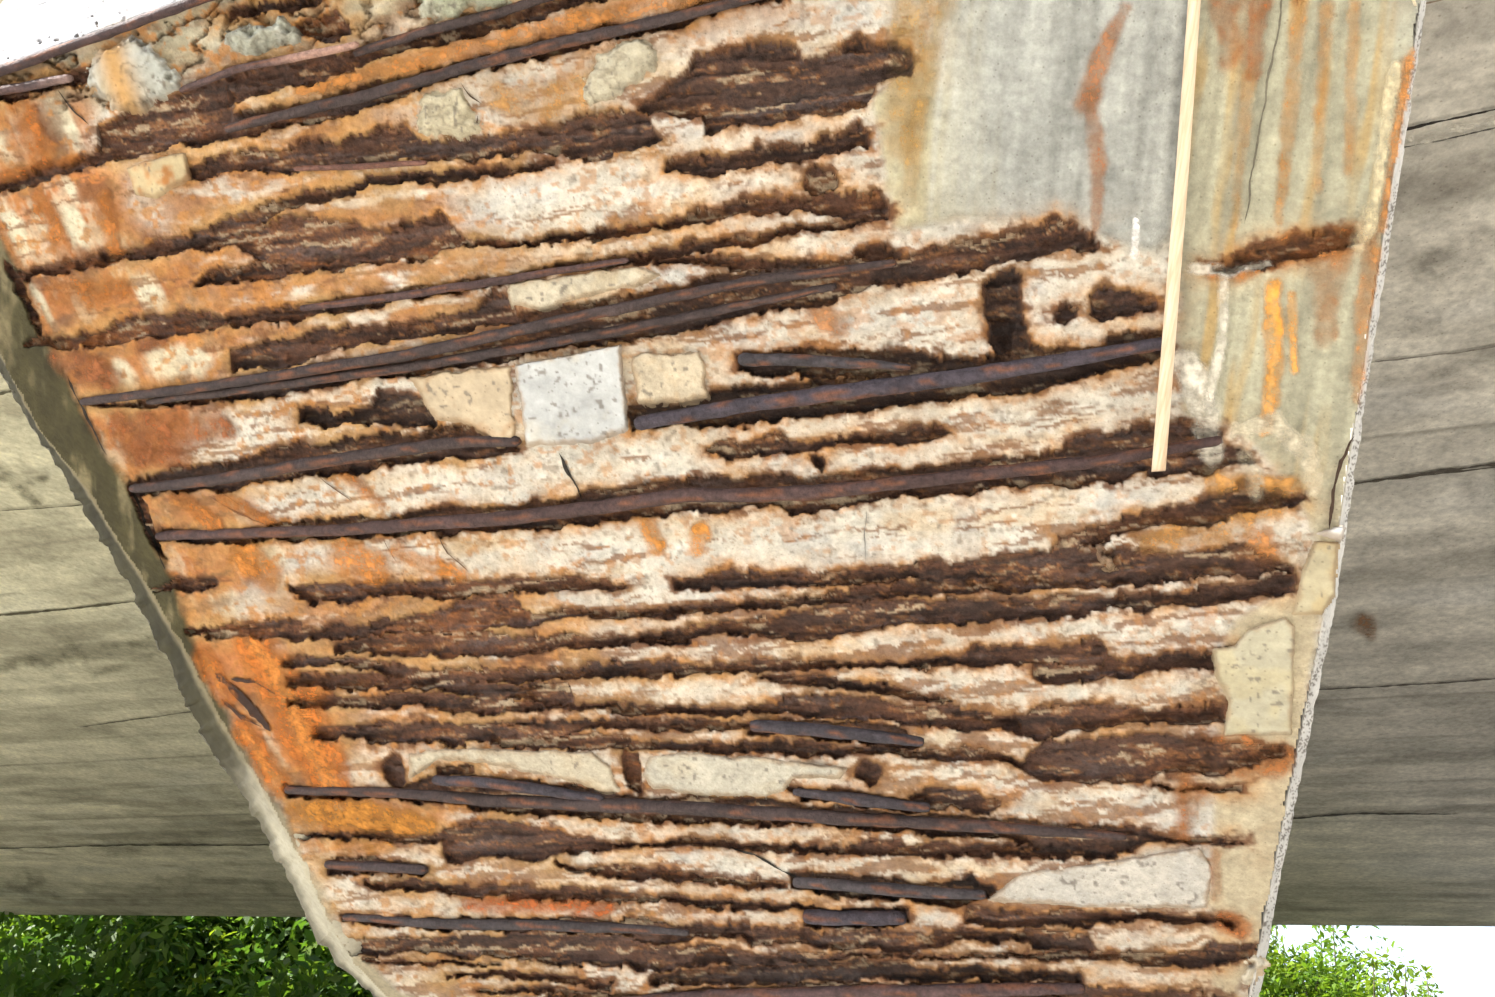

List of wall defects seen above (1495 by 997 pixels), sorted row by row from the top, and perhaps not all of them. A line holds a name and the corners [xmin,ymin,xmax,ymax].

corrosion [295,0,705,96]
corrosion [1076,6,1130,231]
spalling [0,0,1255,557]
corrosion [1207,262,1298,435]
spalling [1216,227,1358,274]
corrosion [1311,50,1415,384]
spalling [152,578,218,593]
corrosion [231,542,276,591]
corrosion [1141,473,1298,559]
corrosion [234,636,436,854]
spalling [185,479,1346,997]
corrosion [465,897,613,917]